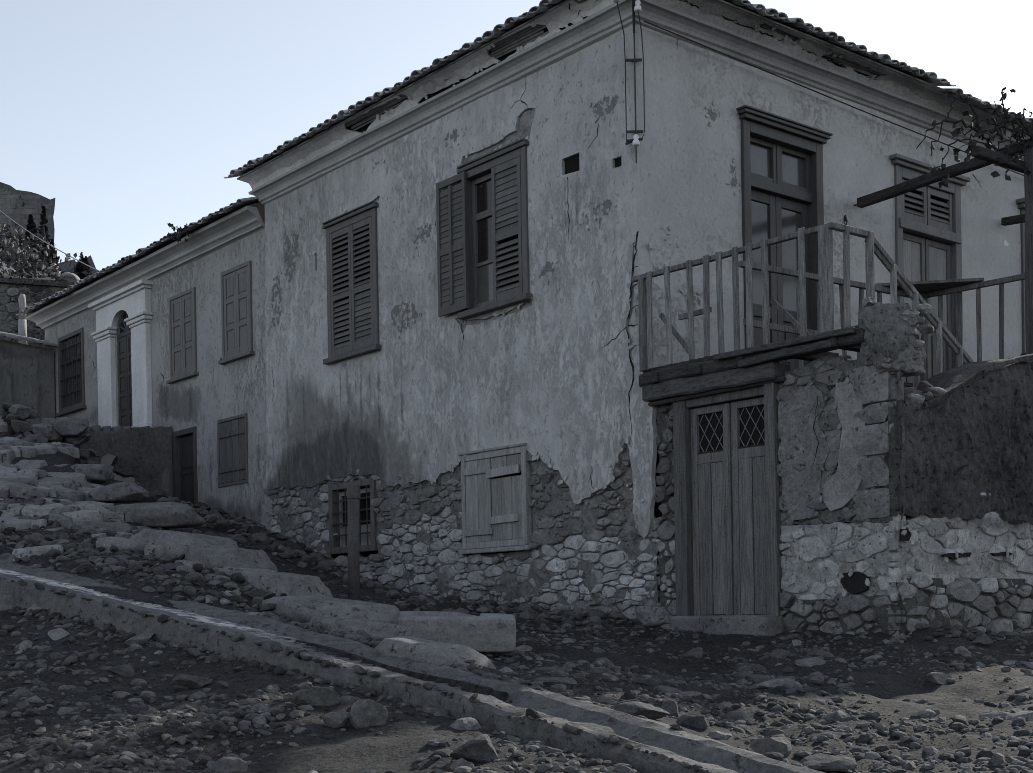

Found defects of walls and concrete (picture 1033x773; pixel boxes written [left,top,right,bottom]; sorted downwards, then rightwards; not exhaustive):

spalling [419,43,503,103]
peeling [589,94,624,123]
crack [602,231,639,439]
spalling [263,436,662,620]